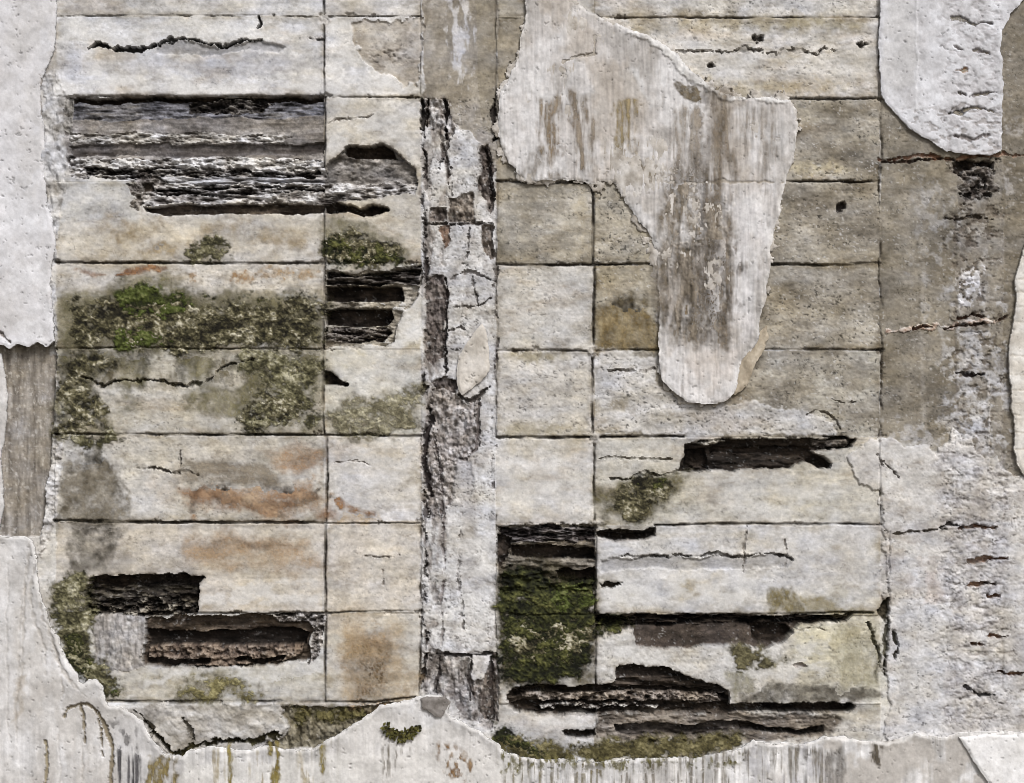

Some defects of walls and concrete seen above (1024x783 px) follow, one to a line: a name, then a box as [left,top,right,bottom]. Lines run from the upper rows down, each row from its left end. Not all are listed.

crack [87,15,263,54]
crack [674,44,836,56]
flaking render [856,0,1023,205]
spalling [61,95,418,216]
crack [877,150,1024,165]
crack [83,357,255,389]
leakage [54,276,321,426]
spalling [324,265,490,519]
leakage [593,474,682,524]
crack [619,524,794,575]
spalling [84,572,327,672]
spalling [418,648,730,730]